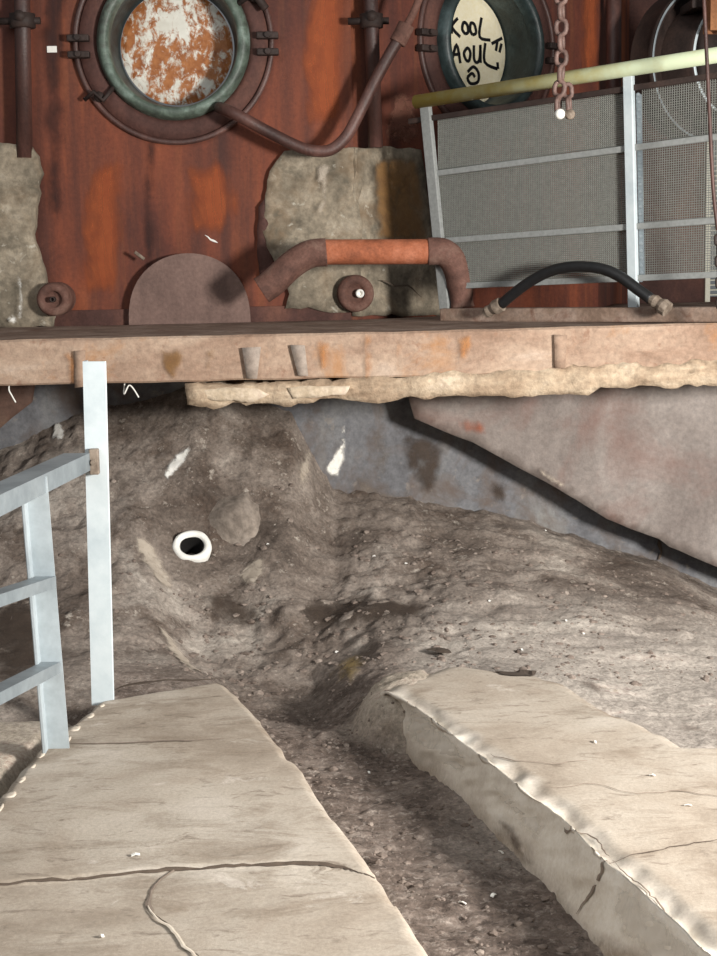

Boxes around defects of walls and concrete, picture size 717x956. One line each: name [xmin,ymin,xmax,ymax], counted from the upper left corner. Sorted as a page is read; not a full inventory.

crack [491,754,716,796]
crack [0,861,375,924]
crack [564,828,717,918]